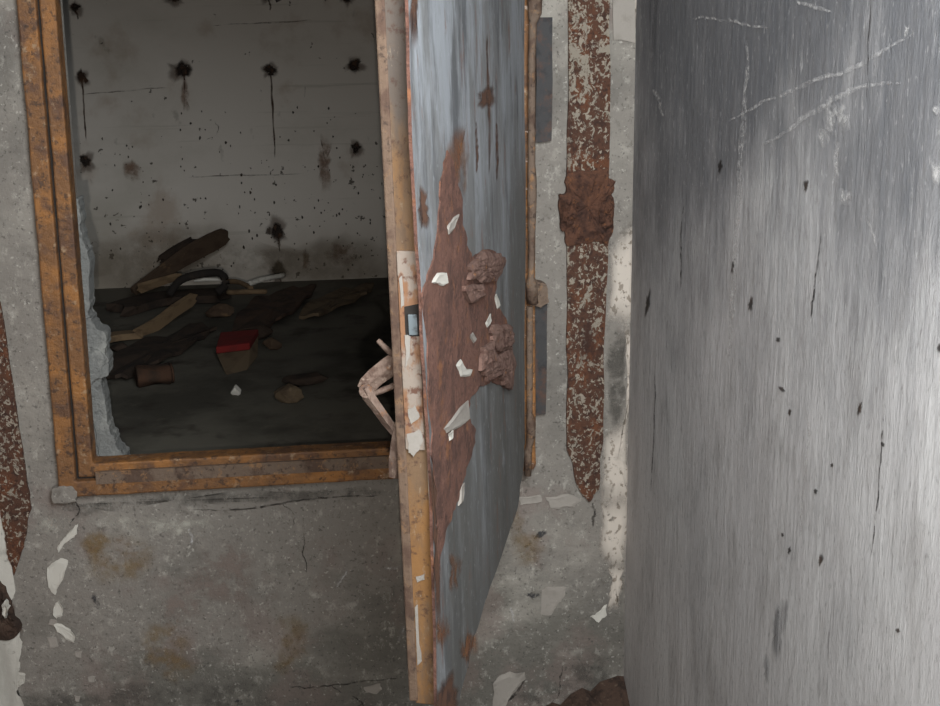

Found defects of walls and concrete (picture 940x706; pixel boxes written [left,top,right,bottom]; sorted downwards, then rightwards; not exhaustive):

rust [77,70,88,137]
rust [176,62,191,90]
rust [264,65,276,146]
rust [272,223,285,282]
spalling [76,195,131,456]
rust [418,40,517,613]
peeling [47,524,82,658]
rust [436,675,457,706]